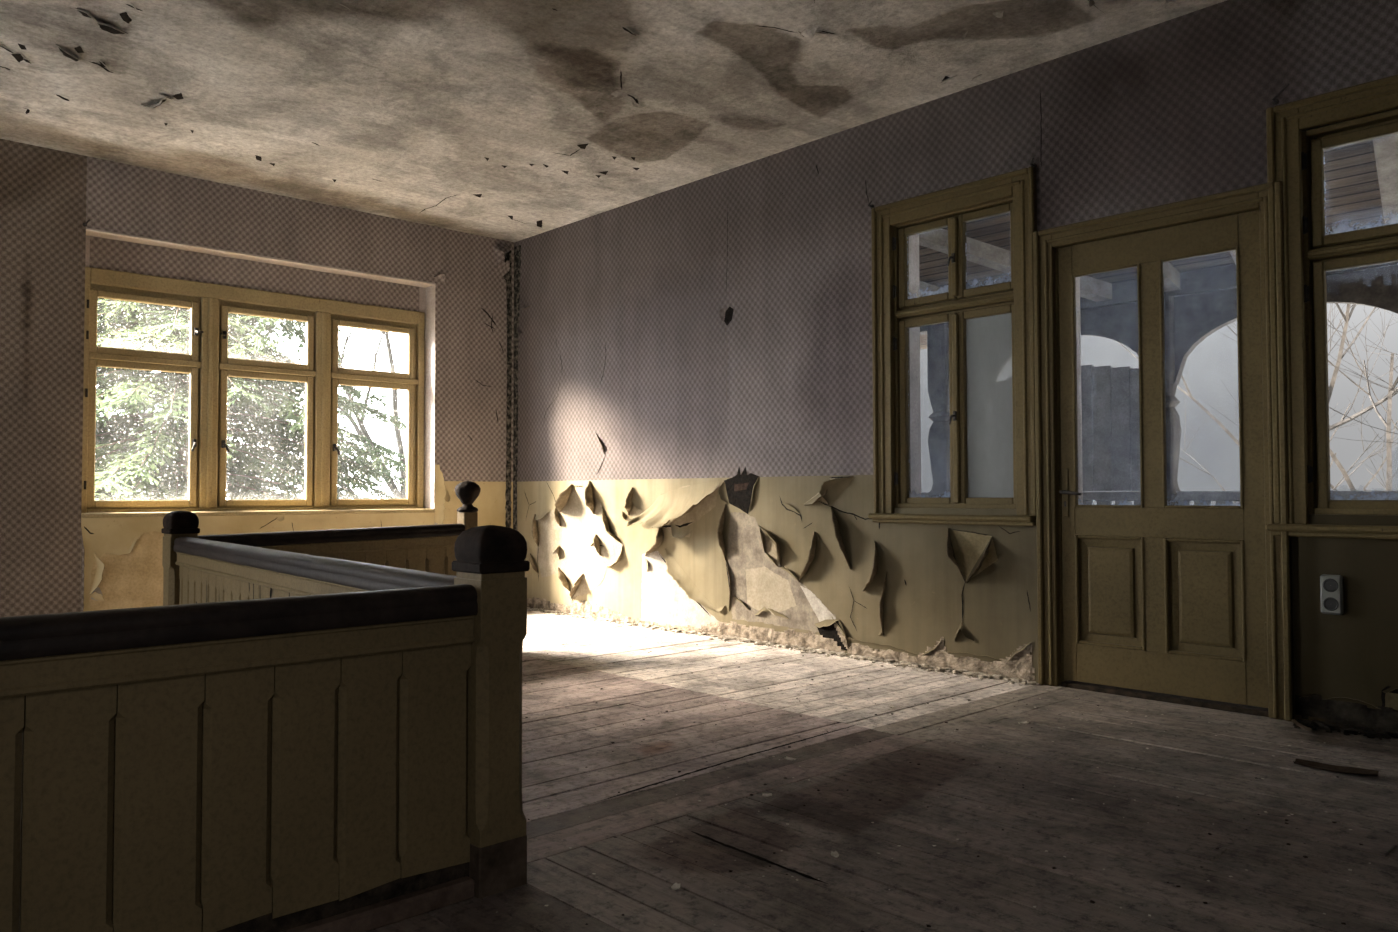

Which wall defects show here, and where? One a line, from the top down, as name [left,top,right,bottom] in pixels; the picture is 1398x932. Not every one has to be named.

peeling [77,3,142,35]
peeling [0,43,31,70]
peeling [56,45,113,73]
peeling [80,522,164,612]
flaking render [527,467,1031,662]